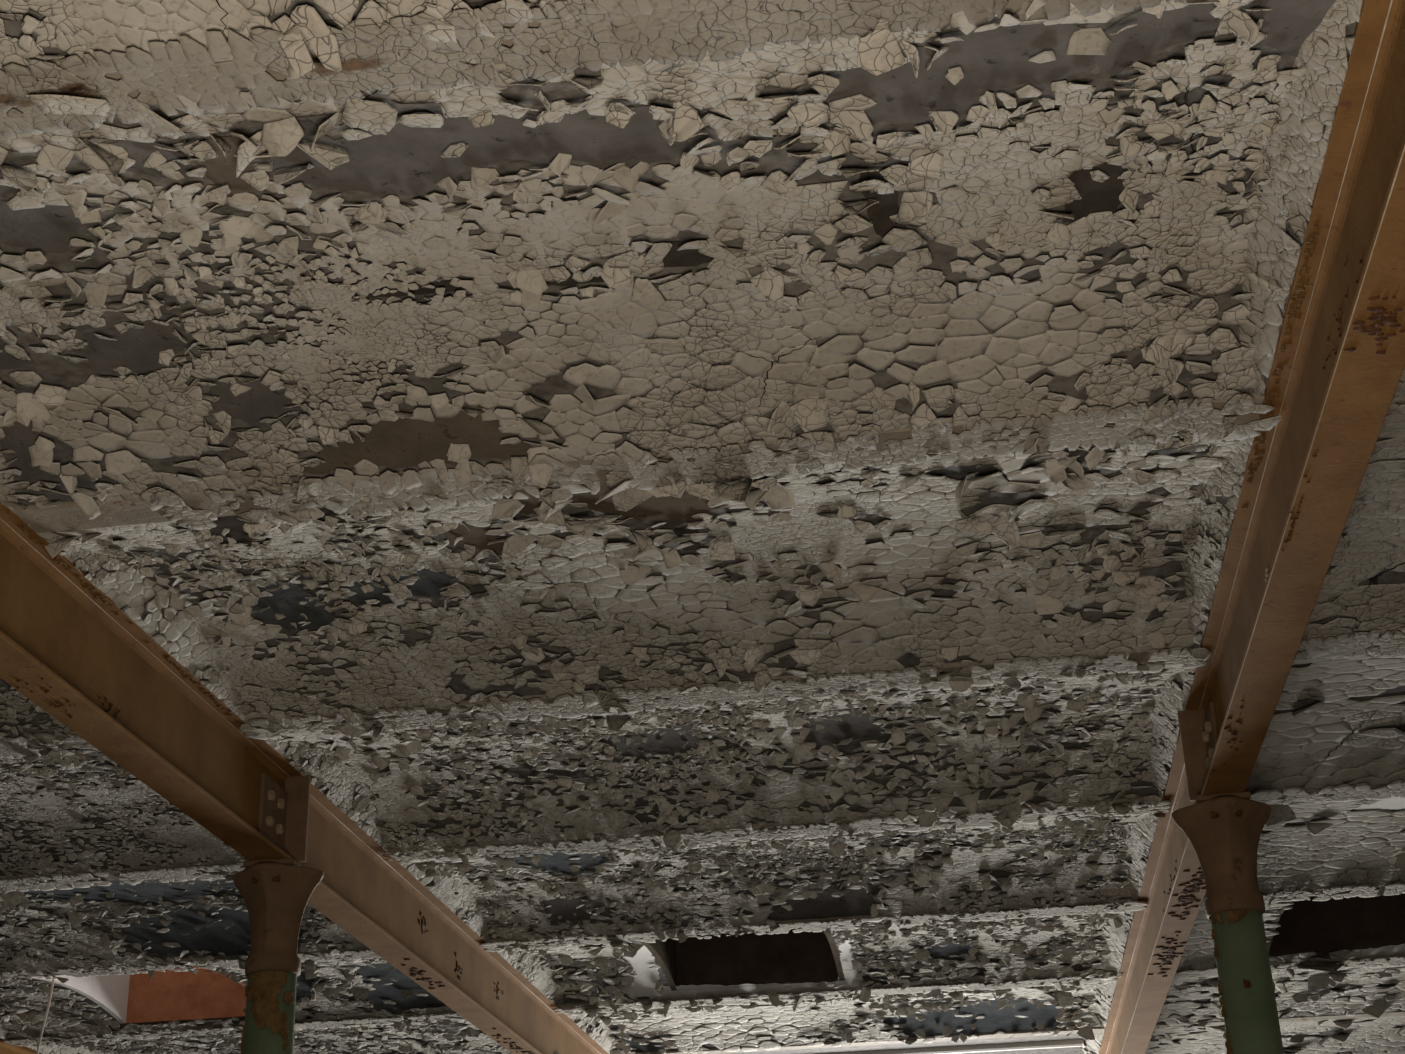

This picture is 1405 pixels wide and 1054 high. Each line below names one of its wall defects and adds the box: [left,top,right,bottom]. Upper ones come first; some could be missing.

crack [0,0,1186,138]
crack [1172,83,1218,153]
peeling [0,0,1363,520]
crack [737,337,820,406]
corrosion [1323,260,1405,370]
crack [150,394,1282,530]
peeling [0,425,1254,1054]
peeling [1247,411,1405,1054]